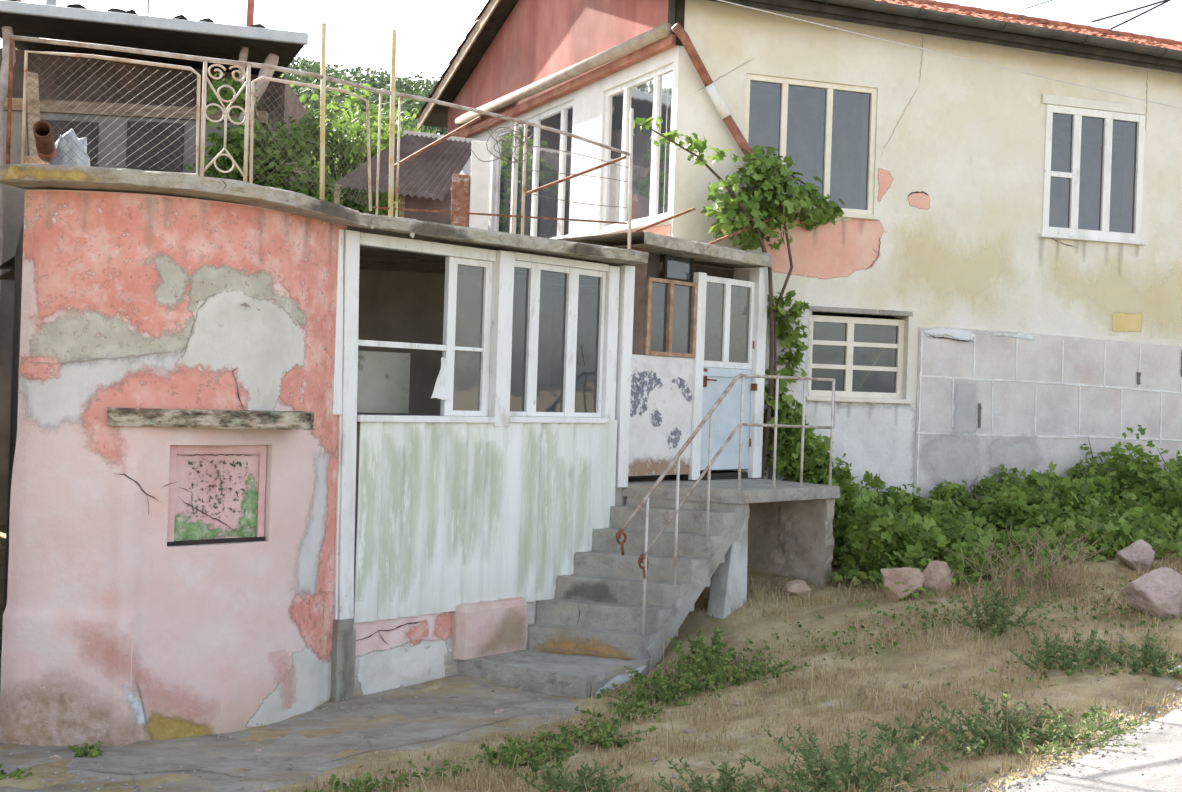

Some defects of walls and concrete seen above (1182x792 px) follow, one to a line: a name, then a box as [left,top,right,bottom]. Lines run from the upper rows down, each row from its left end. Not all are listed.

crack [881,38,929,197]
peeling [875,168,893,201]
spalling [906,191,930,209]
peeling [763,217,887,279]
peeling [630,367,692,448]
peeling [18,191,346,727]
crack [120,454,259,530]
spalling [353,611,452,695]